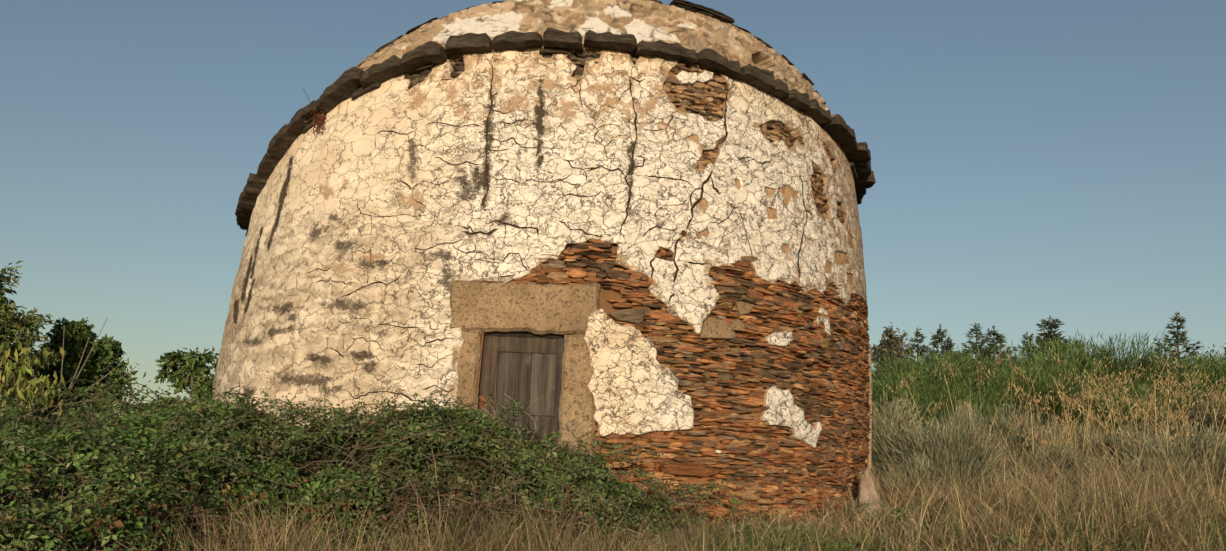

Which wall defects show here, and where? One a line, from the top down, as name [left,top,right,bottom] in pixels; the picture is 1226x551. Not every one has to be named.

crack [308,54,819,401]
spalling [482,120,873,531]
spalling [663,62,729,124]